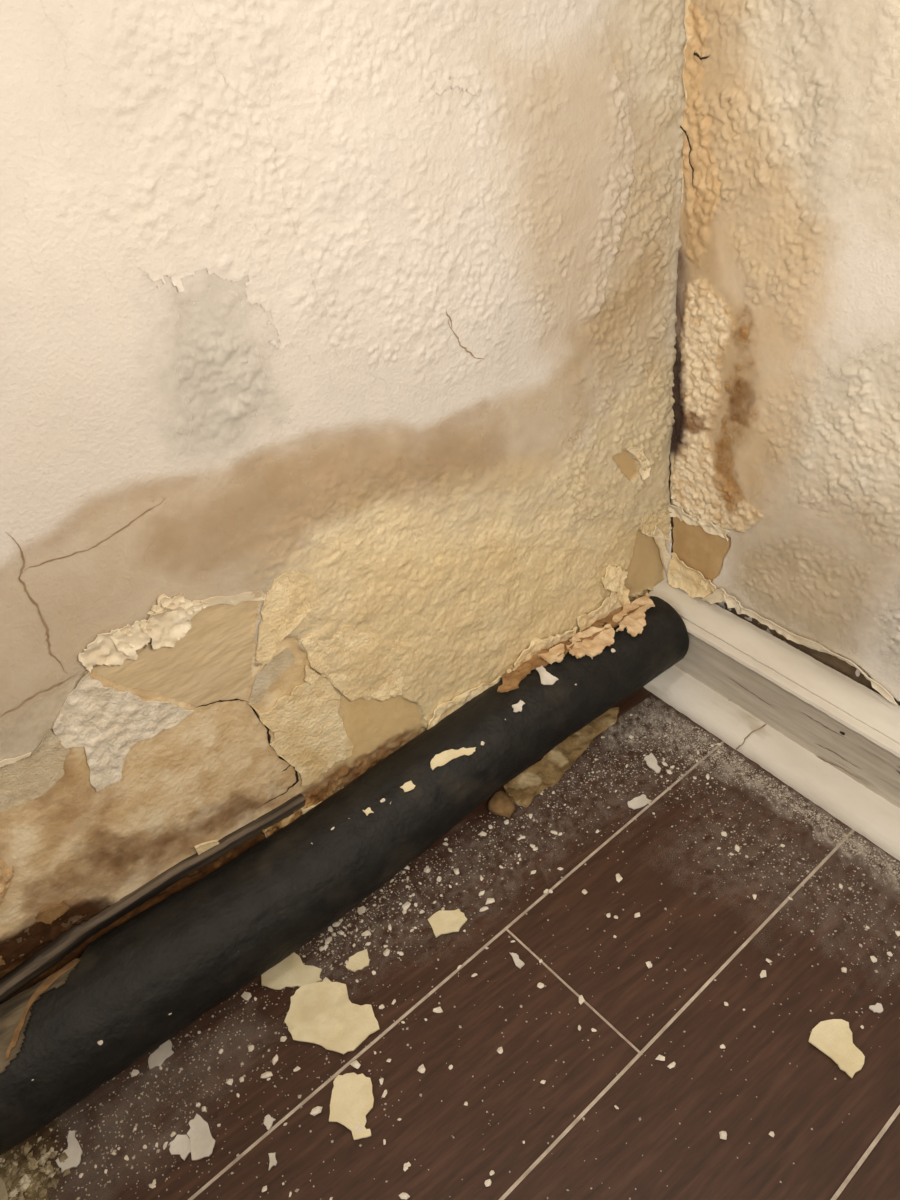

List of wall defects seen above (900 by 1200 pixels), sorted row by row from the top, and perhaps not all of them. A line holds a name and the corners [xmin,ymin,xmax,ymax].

damp [668,0,784,533]
crack [1,498,166,717]
peeling [497,504,900,712]
damp [0,674,83,761]
peeling [0,570,427,1003]
peeling [430,747,476,770]
peeling [627,794,652,809]
peeling [644,753,661,773]
damp [0,899,114,969]
peeling [509,952,525,969]